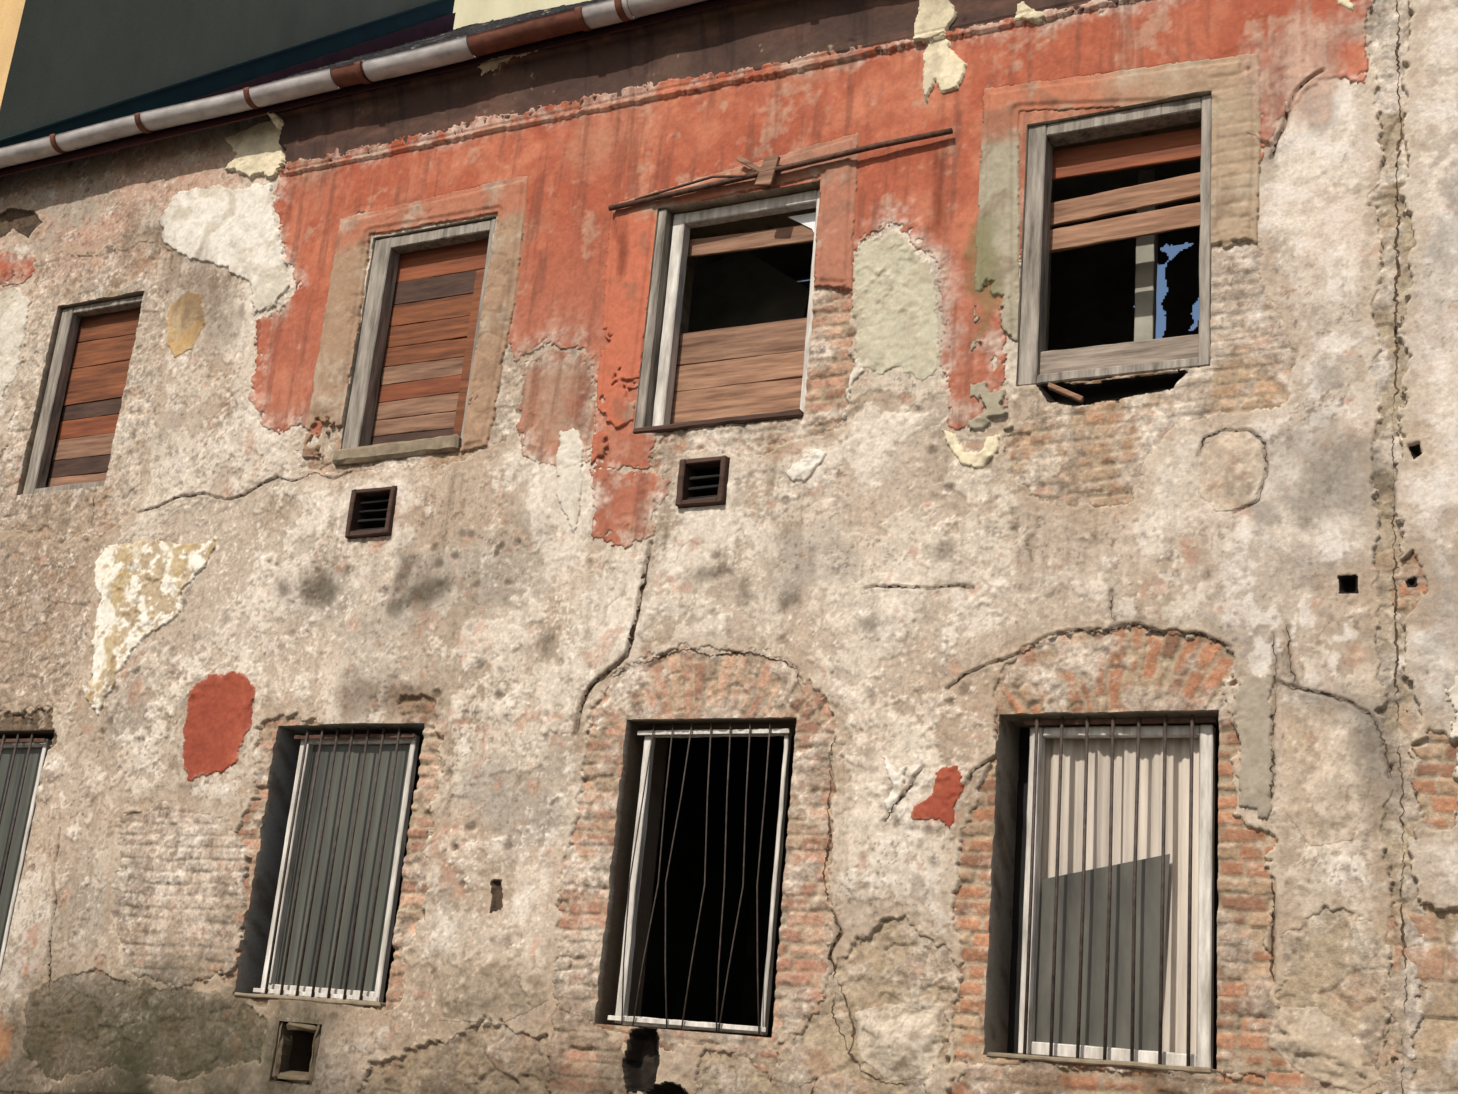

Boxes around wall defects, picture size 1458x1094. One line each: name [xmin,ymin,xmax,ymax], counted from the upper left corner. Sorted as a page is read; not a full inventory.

spalling [0,237,216,747]
spalling [22,671,318,1082]
crack [141,471,352,513]
crack [577,554,801,732]
peeling [159,0,1427,953]
spalling [359,626,1361,1094]
crack [1268,0,1408,1094]
spalling [1376,904,1458,1094]
spalling [1411,676,1458,831]